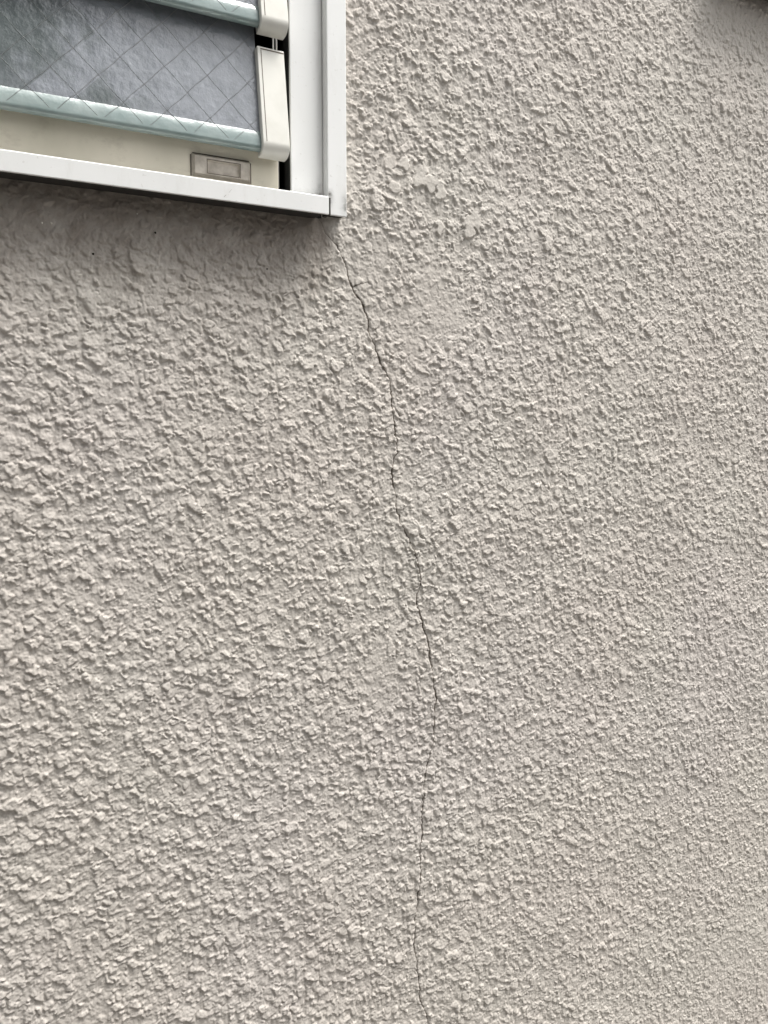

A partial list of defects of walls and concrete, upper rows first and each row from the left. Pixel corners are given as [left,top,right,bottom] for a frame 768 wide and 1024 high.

crack [318,218,444,1022]